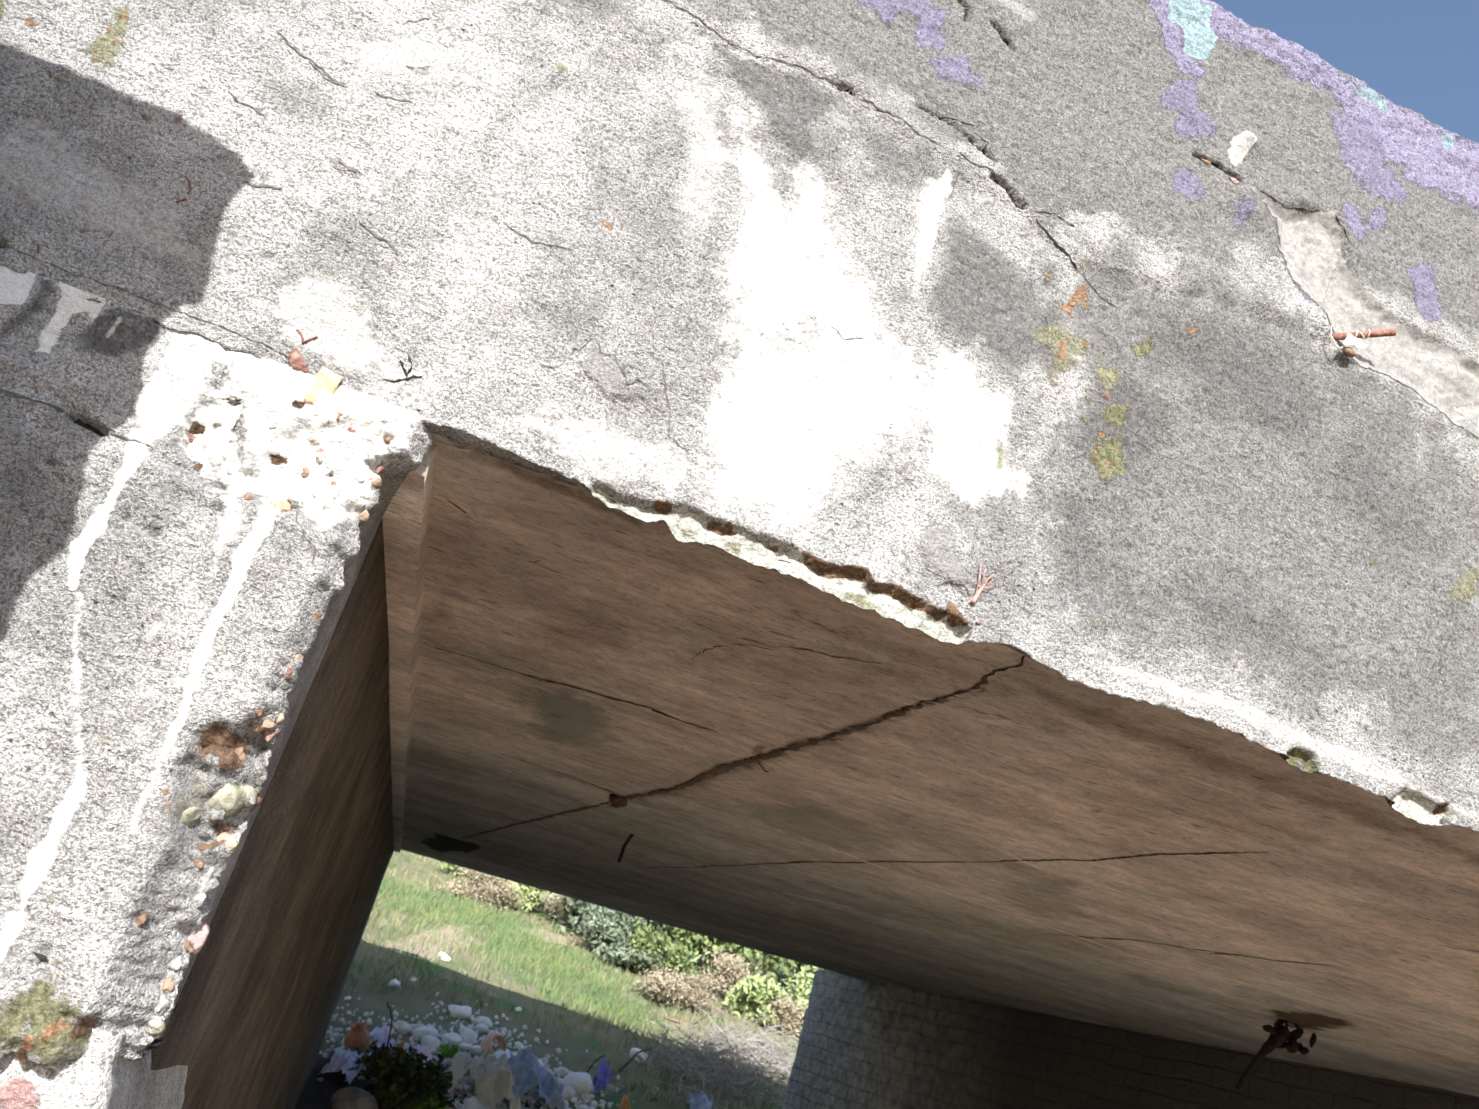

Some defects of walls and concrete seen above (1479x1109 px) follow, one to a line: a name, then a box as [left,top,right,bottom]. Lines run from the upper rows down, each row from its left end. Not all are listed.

crack [666,0,1123,310]
crack [1262,191,1350,243]
crack [0,246,307,366]
crack [0,388,153,448]
crack [223,380,243,433]
leakage [240,389,305,459]
leakage [482,0,1479,816]
leakage [0,266,234,962]
leakage [156,494,279,762]
spalling [590,486,972,644]
crack [420,641,1025,838]
crack [636,852,1266,868]